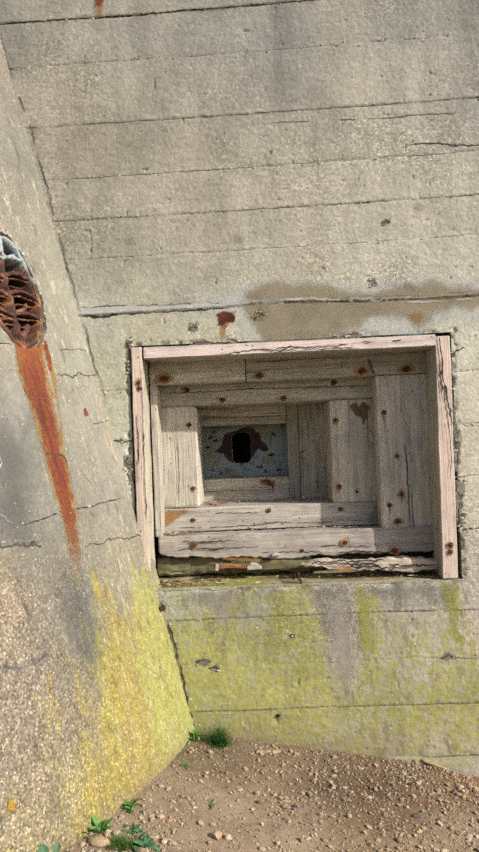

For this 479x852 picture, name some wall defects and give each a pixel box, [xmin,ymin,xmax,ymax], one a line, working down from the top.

rust [95,0,104,19]
crack [0,0,421,76]
rust [217,311,236,343]
crack [1,96,479,547]
damp [244,281,479,342]
rust [2,303,79,546]
crack [168,616,276,731]
damp [320,588,376,698]
damp [440,580,463,641]